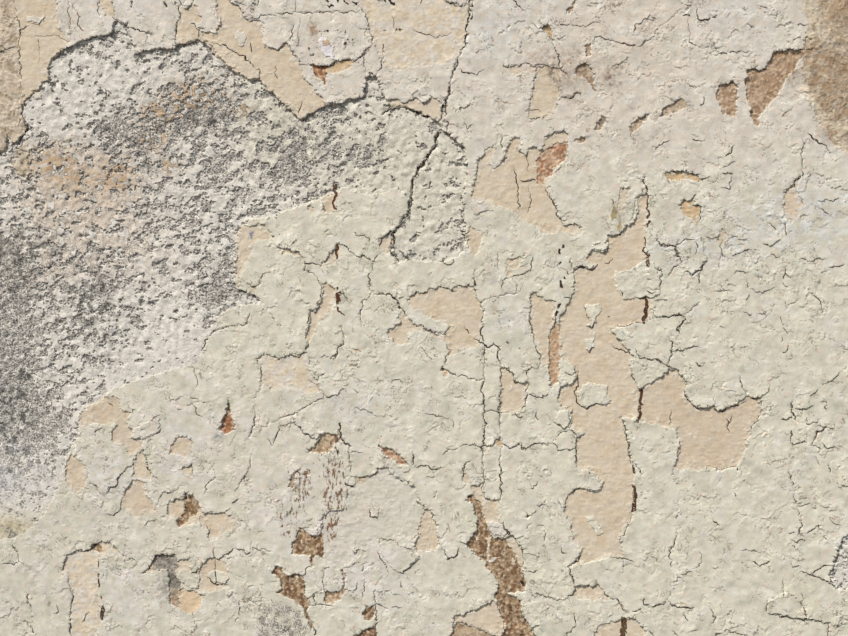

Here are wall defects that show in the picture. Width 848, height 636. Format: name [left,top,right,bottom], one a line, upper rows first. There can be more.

crack [236,1,384,73]
crack [554,4,750,74]
peeling [716,0,848,152]
flaking render [0,0,586,552]
crack [304,59,611,500]
crack [584,223,847,369]
crack [228,328,371,487]
peeling [526,188,762,567]
flaking render [272,566,316,635]
peeling [292,445,440,604]
flaking render [450,470,534,636]
crack [766,473,844,636]